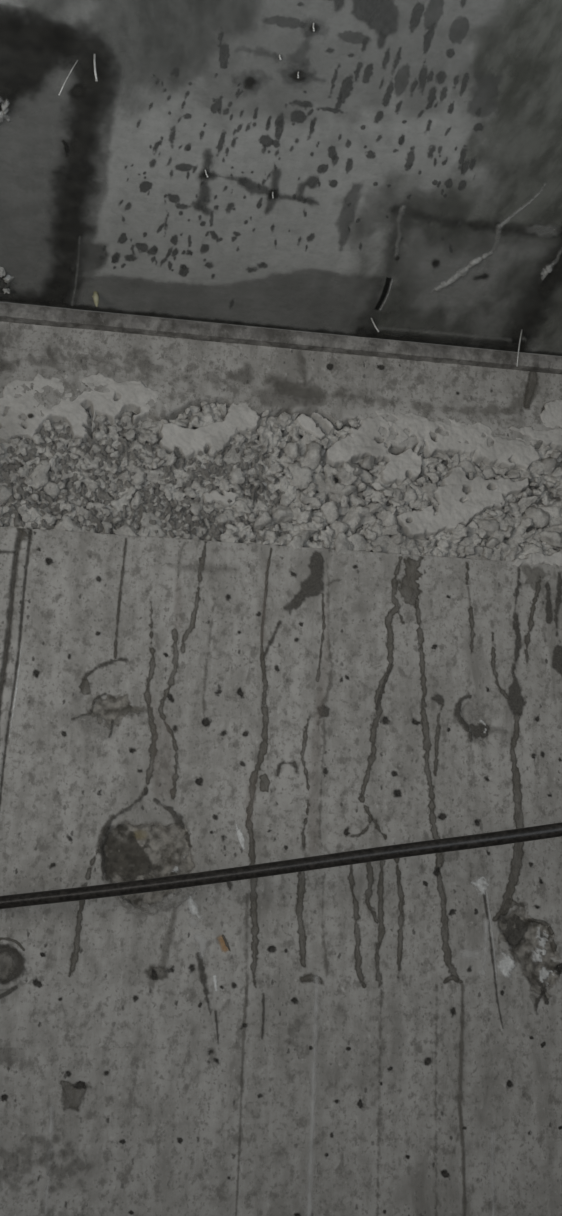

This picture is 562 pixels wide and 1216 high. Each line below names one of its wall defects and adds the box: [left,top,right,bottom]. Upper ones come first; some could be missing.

damp [334,0,397,47]
damp [0,0,244,305]
damp [193,151,318,214]
flaking render [43,444,248,542]
flaking render [223,442,259,484]
flaking render [303,442,397,538]
damp [144,541,208,799]
damp [236,548,330,987]
damp [491,568,562,921]
spalling [98,789,195,915]
damp [348,556,466,1216]
spalling [498,904,560,1011]